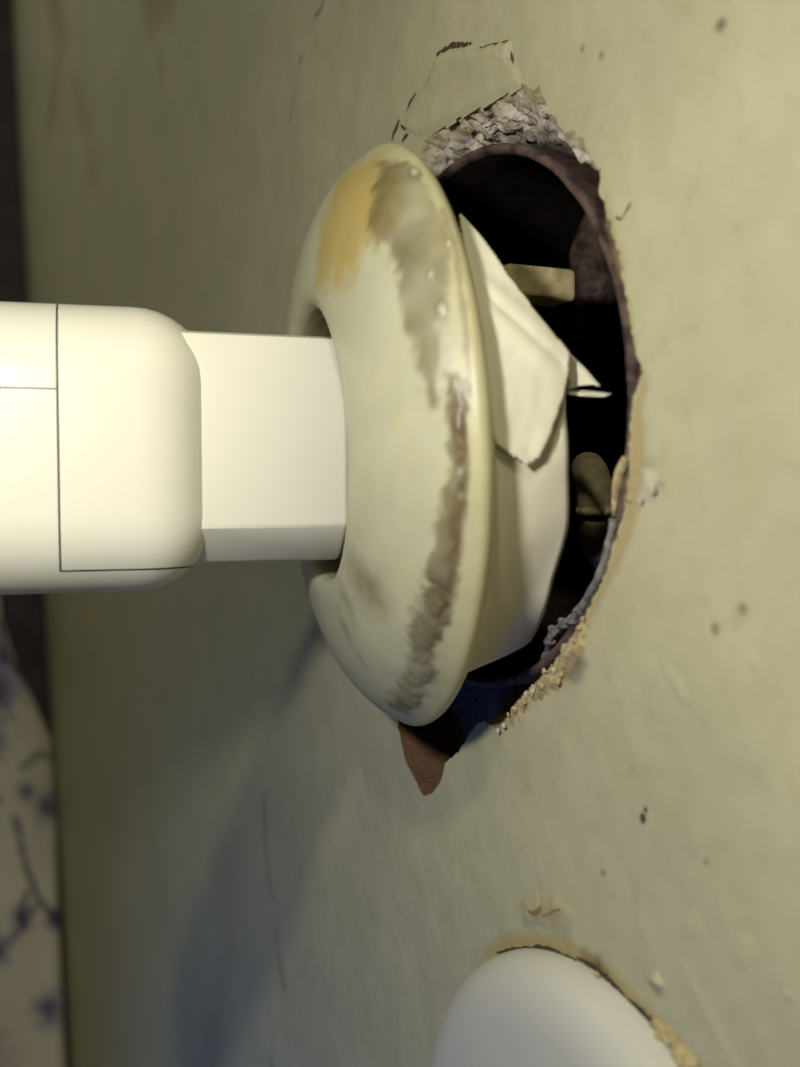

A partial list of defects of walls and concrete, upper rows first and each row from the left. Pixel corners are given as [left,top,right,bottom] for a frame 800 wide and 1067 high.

peeling [405,38,600,178]
flaking render [612,408,663,567]
flaking render [398,597,599,796]
spalling [644,1010,701,1067]